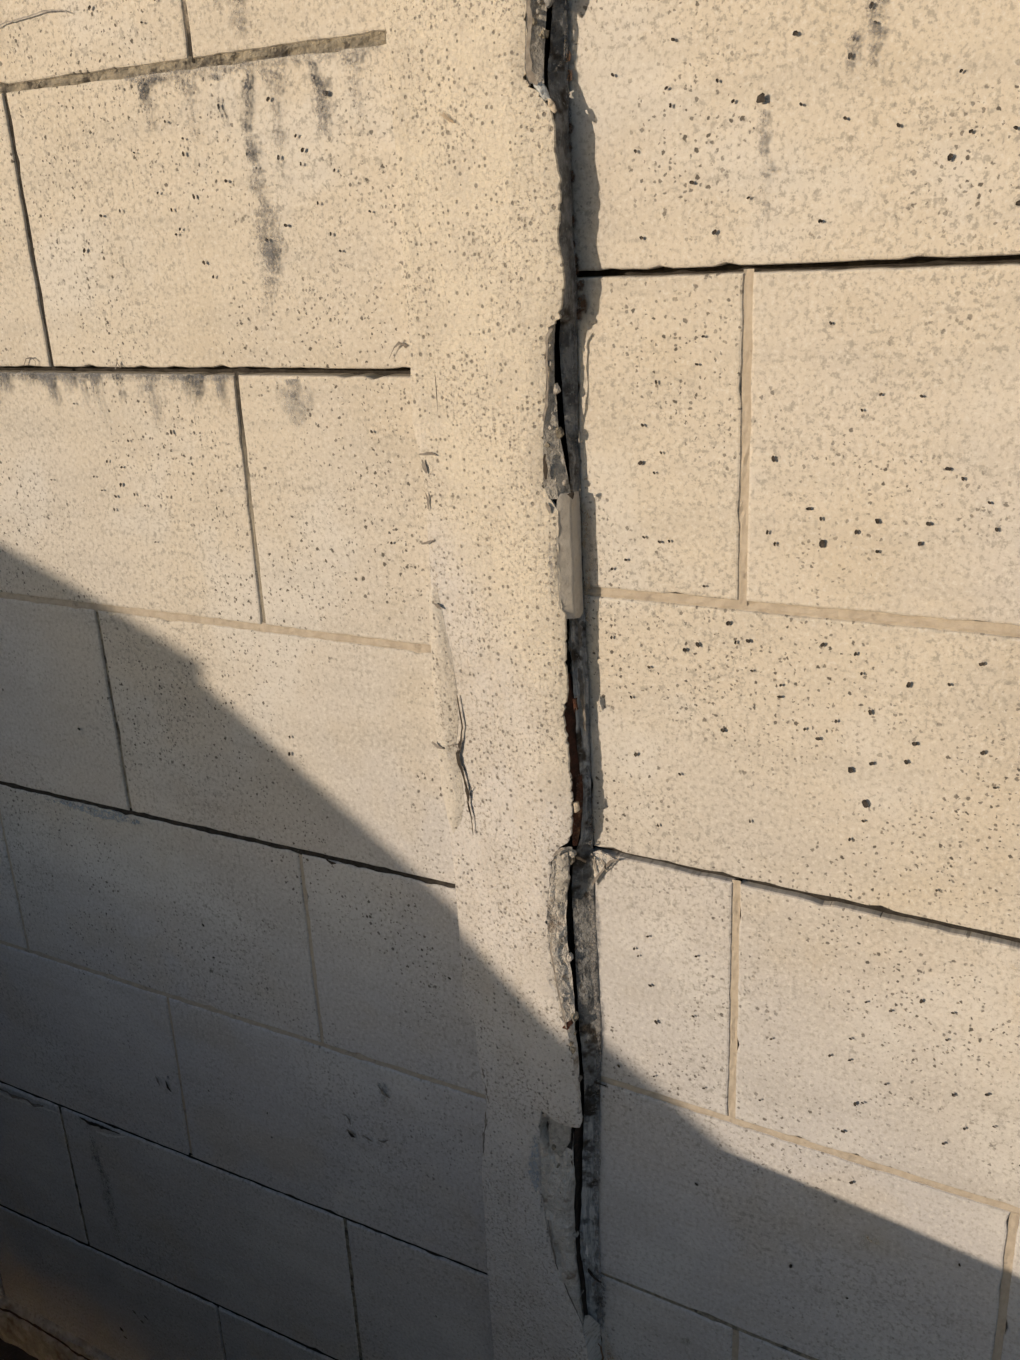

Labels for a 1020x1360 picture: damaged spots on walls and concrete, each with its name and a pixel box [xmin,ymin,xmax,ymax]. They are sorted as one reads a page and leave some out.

damp [138,78,161,125]
damp [308,61,327,133]
damp [242,69,281,298]
crack [448,695,473,833]
corrosion [564,673,583,846]
crack [575,850,619,886]
spalling [540,847,585,1325]